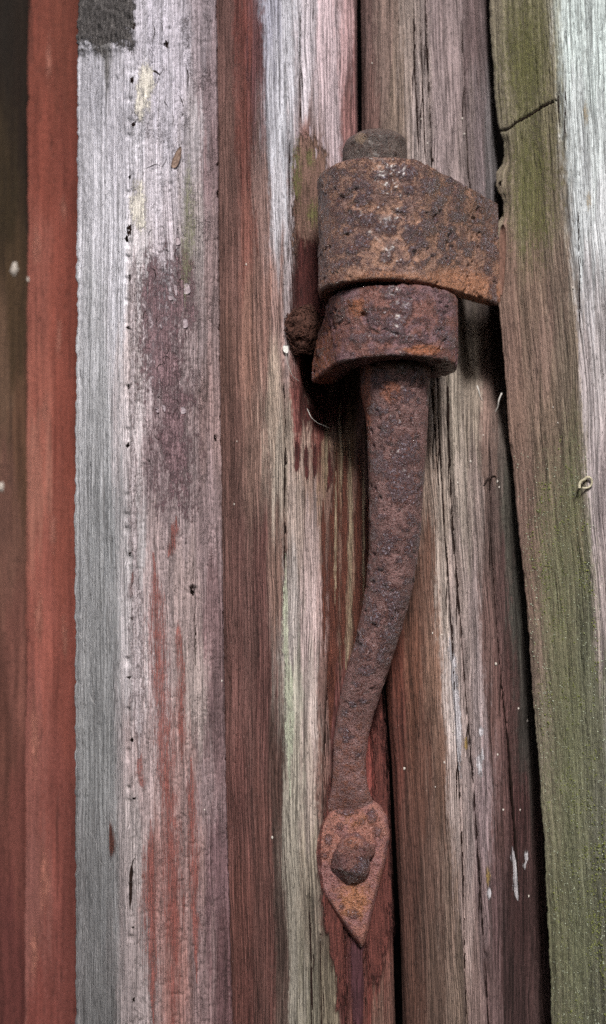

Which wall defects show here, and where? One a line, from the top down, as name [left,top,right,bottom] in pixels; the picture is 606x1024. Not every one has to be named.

crack [500,89,567,149]
rust [290,233,327,320]
rust [294,352,369,738]